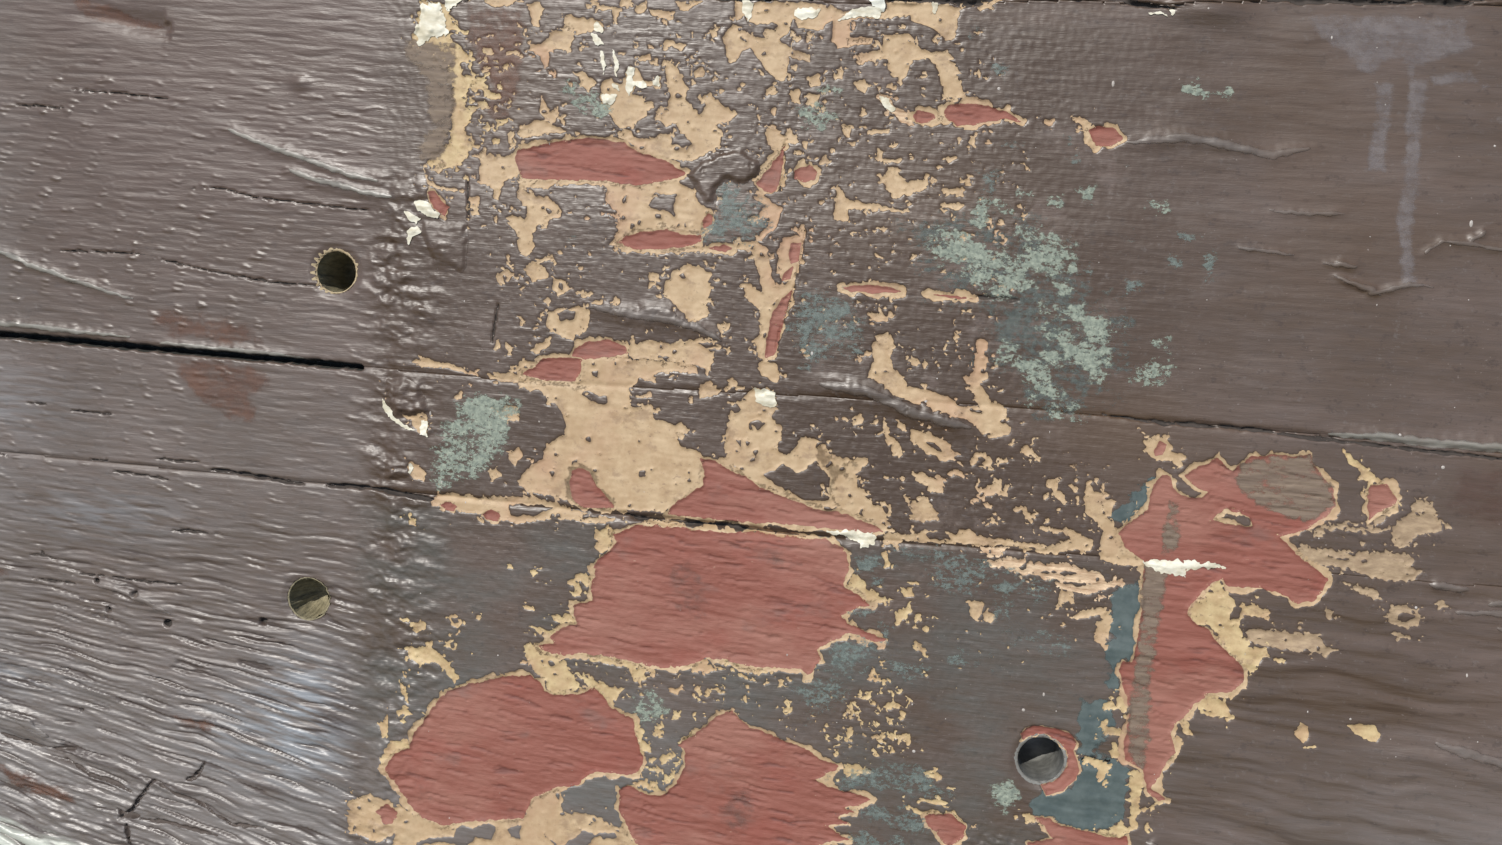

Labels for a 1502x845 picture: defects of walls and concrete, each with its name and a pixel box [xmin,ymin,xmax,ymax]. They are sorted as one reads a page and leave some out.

crack [0,732,260,845]
peeling [344,0,1452,845]